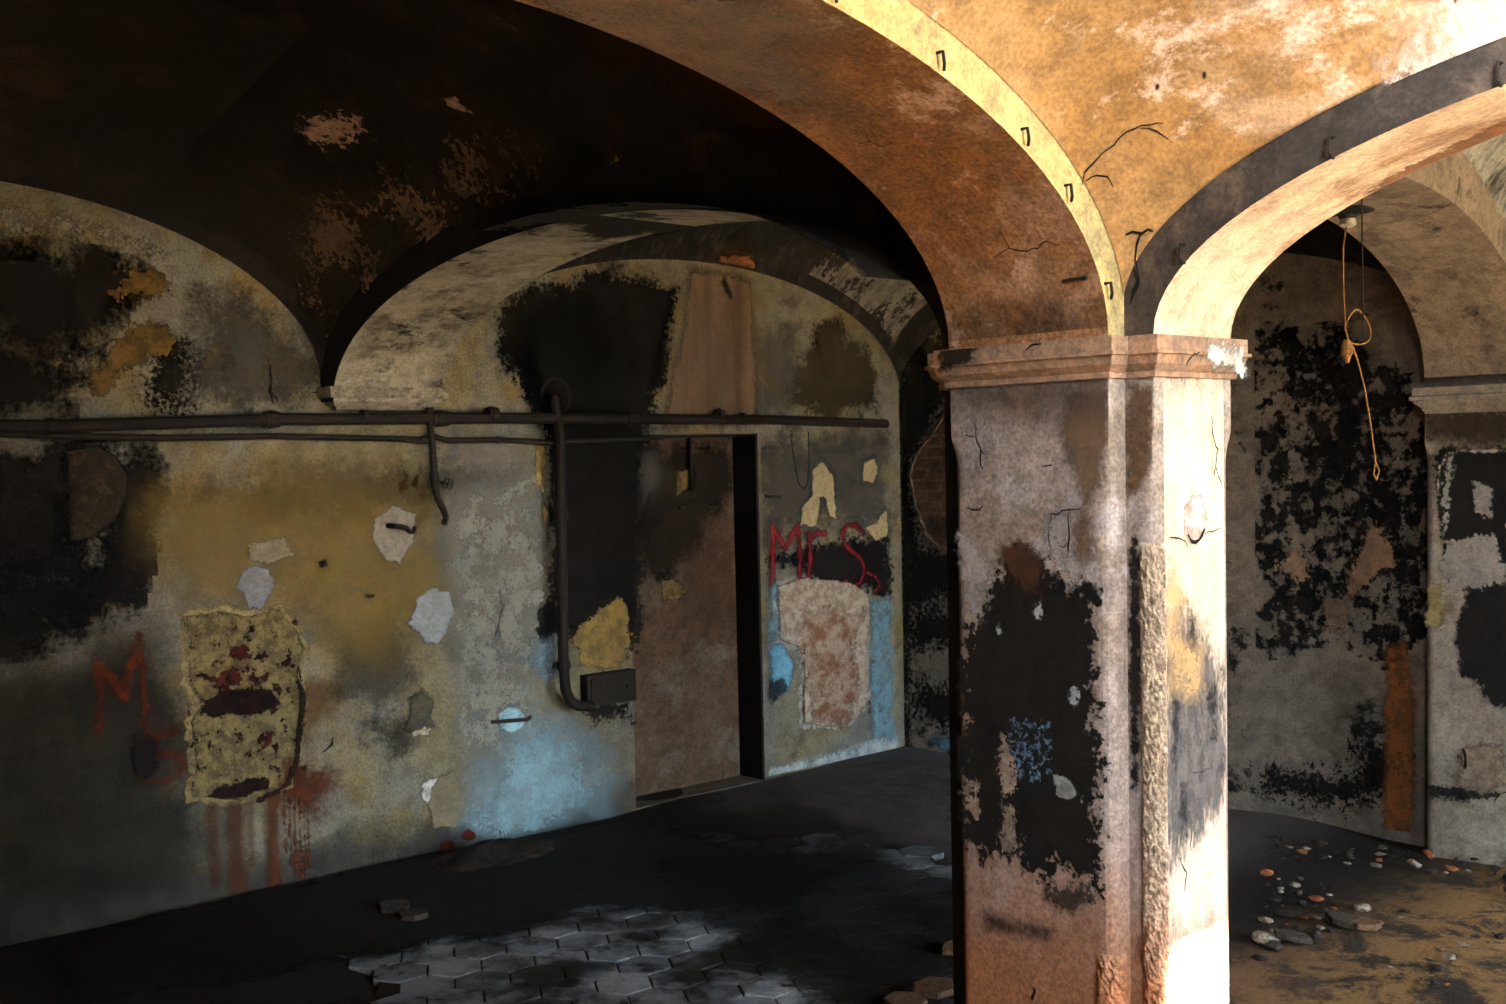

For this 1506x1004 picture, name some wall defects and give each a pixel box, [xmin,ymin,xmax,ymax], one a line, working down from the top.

peeling [261,96,551,354]
crack [1082,123,1169,186]
flaking render [909,413,996,625]
peeling [1042,488,1090,585]
peeling [1184,495,1207,545]
flaking render [179,537,312,808]
peeling [572,594,634,672]
flaking render [772,573,872,730]
peeling [1053,774,1076,800]
spalling [1097,542,1170,1004]
leakage [1382,642,1416,833]